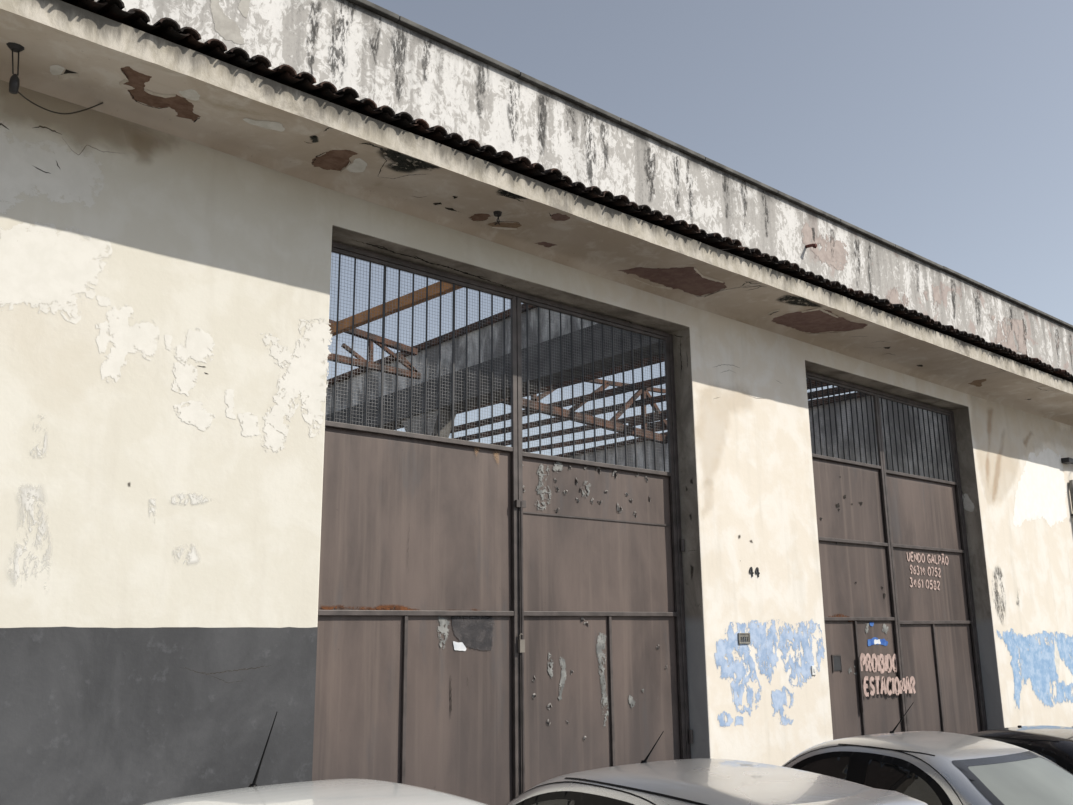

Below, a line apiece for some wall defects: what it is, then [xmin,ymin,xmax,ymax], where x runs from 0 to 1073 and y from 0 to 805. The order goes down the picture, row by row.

water stain [307,3,321,74]
water stain [330,1,355,76]
peeling [119,66,201,122]
water stain [538,97,548,152]
water stain [367,144,439,179]
water stain [496,189,526,202]
peeling [0,120,332,452]
peeling [618,267,727,297]
water stain [778,295,820,307]
peeling [768,308,867,334]
peeling [714,619,825,727]
peeling [996,628,1073,709]